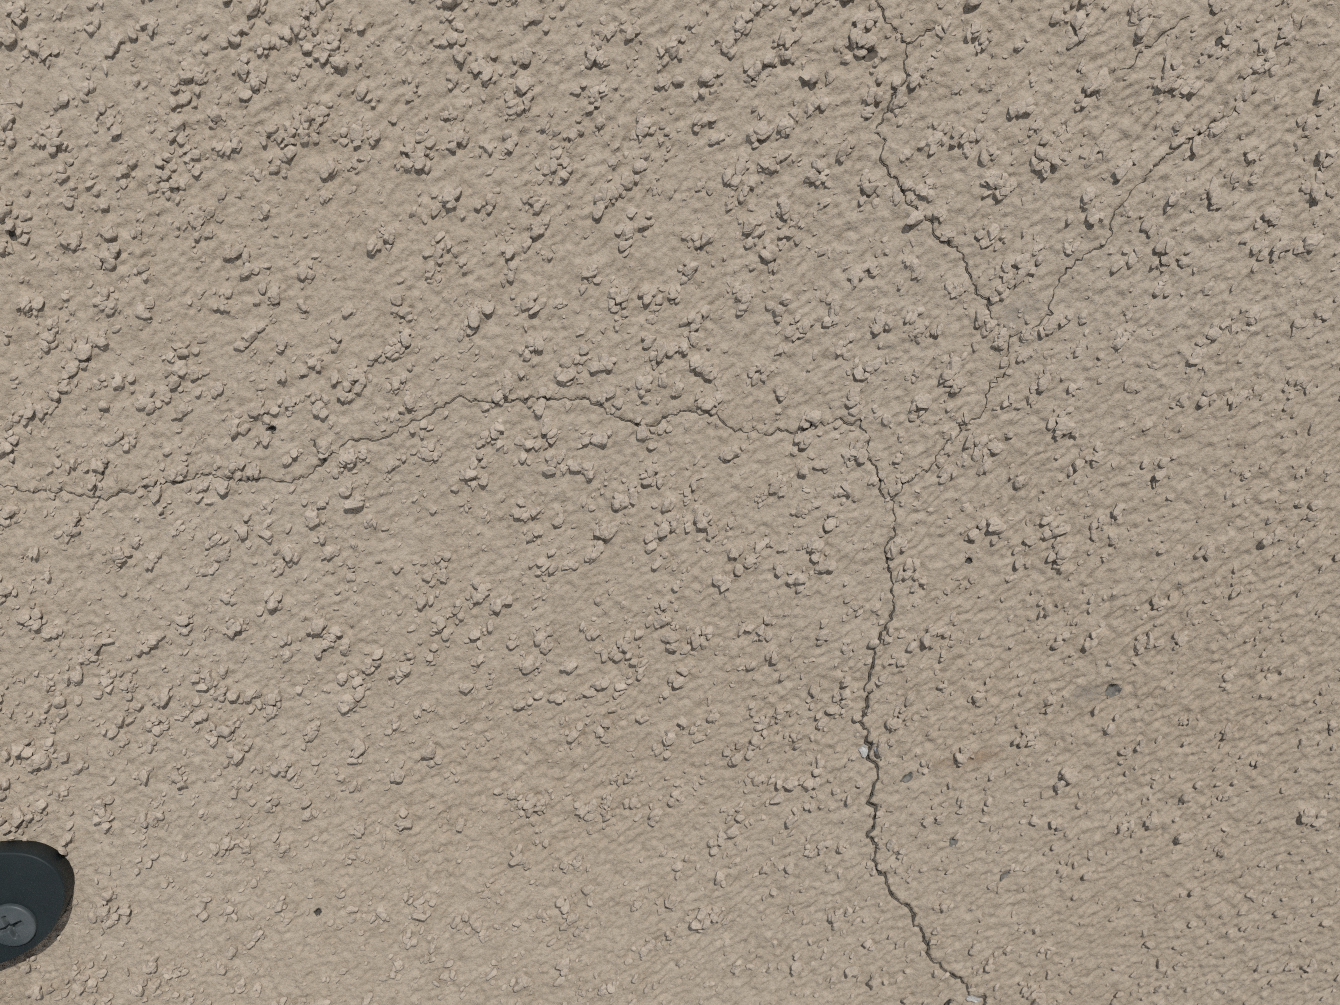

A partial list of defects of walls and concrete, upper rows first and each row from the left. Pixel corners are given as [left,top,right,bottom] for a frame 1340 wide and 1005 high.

crack [1120,16,1188,70]
crack [1033,93,1255,328]
crack [2,461,146,501]
crack [160,0,1022,1005]